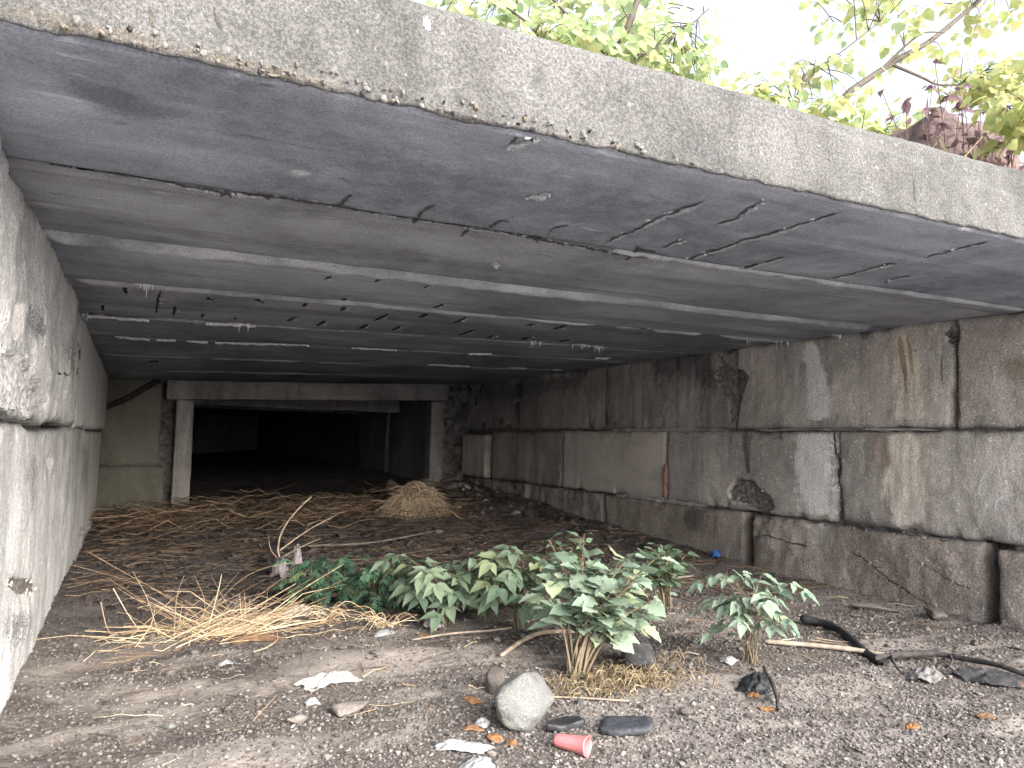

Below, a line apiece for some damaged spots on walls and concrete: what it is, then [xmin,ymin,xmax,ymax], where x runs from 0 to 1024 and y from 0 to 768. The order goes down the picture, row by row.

crack [36,162,840,276]
crack [830,242,989,284]
efflorescence [115,336,309,347]
spalling [713,362,749,421]
corrosion [887,330,932,421]
crack [833,431,970,607]
spalling [6,576,37,596]